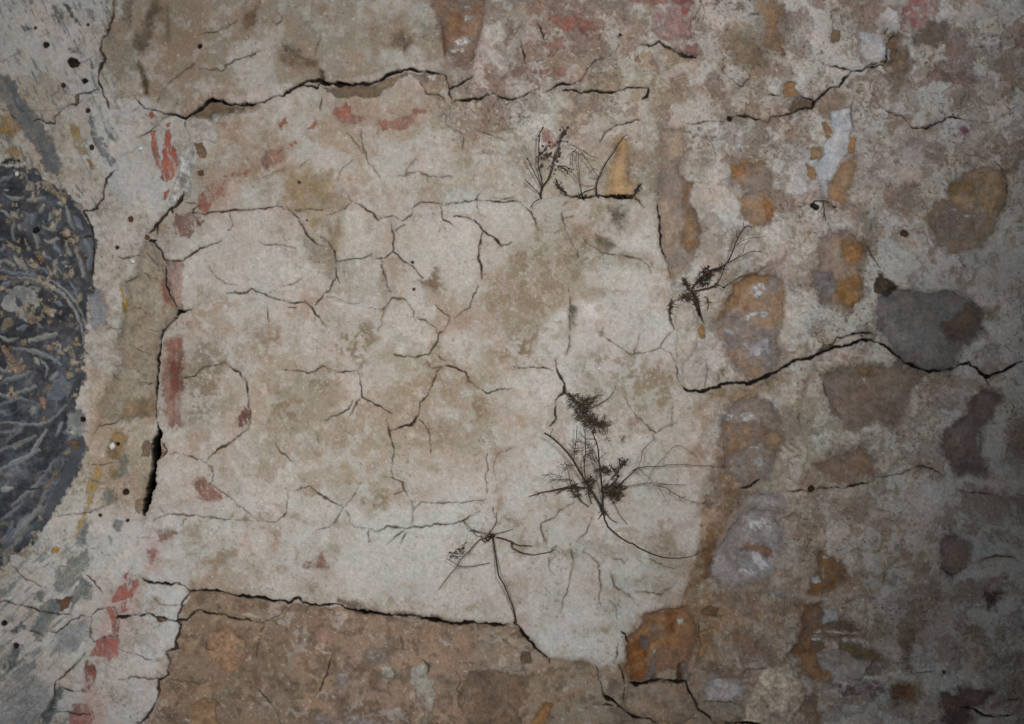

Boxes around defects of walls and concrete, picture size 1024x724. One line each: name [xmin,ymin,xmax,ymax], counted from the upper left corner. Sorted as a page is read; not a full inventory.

crack [134,60,649,140]
crack [562,183,666,270]
spalling [656,127,785,382]
spalling [925,165,1008,255]
crack [149,192,536,492]
crack [531,316,570,426]
crack [676,332,1022,393]
spalling [811,229,984,429]
crack [143,364,251,520]
spalling [701,396,787,586]
spalling [939,389,1002,478]
spalling [624,605,746,724]